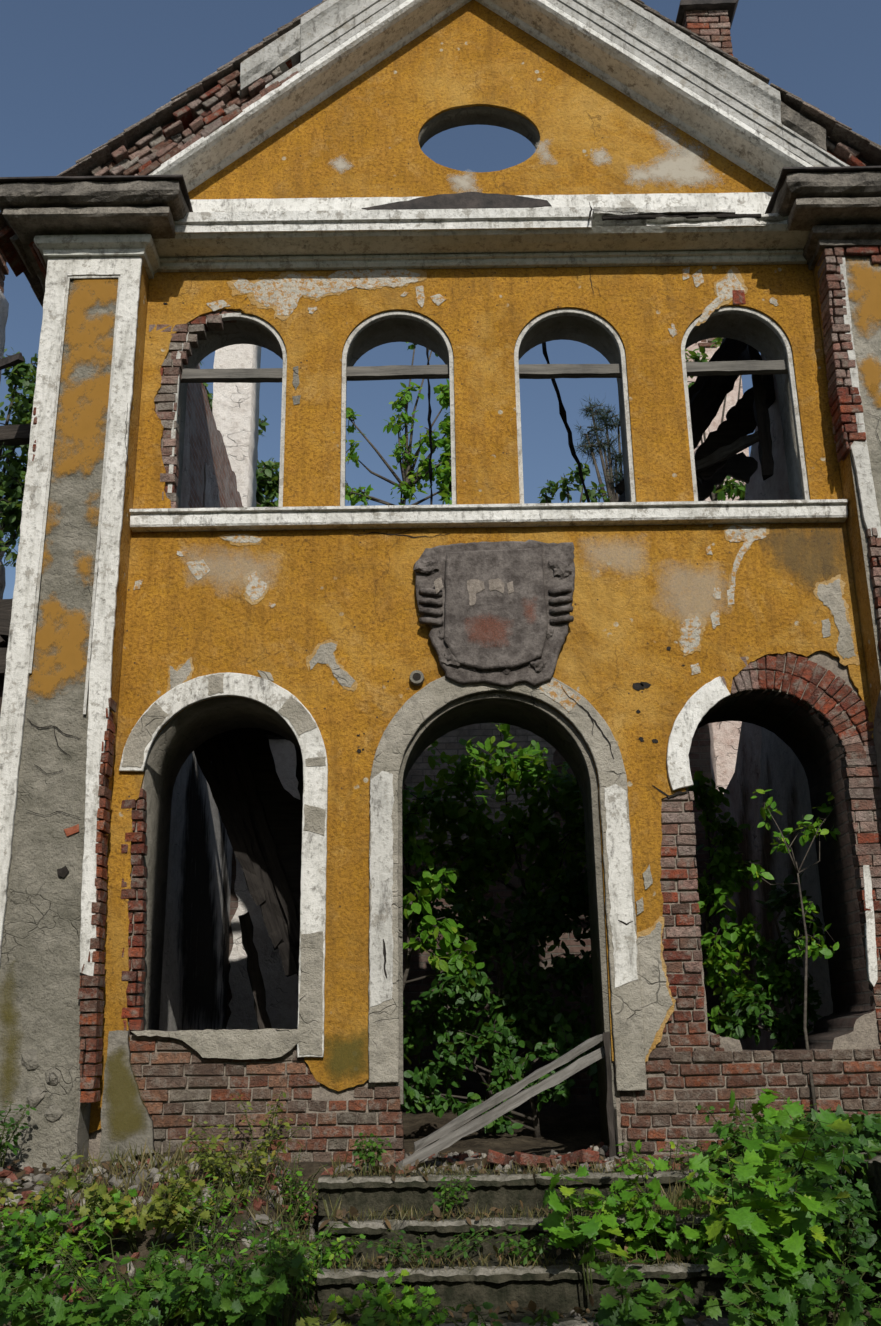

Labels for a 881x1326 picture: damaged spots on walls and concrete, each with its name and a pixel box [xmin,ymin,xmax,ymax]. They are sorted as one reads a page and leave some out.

peeling [628,125,712,186]
peeling [149,269,447,508]
flaking render [817,246,881,462]
peeling [219,533,263,547]
peeling [243,569,276,608]
peeling [306,638,358,692]
peeling [666,523,770,675]
flaking render [865,527,881,661]
flaking render [77,657,405,1163]
flaking render [604,574,881,1161]
damp [107,1050,142,1138]
damp [328,1038,364,1076]